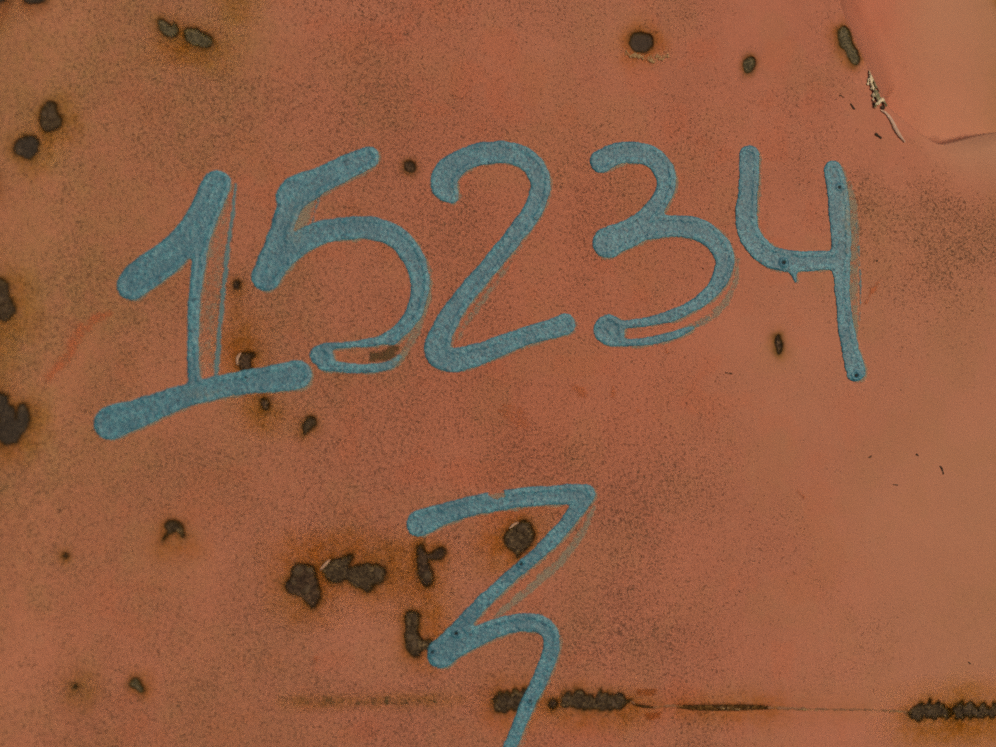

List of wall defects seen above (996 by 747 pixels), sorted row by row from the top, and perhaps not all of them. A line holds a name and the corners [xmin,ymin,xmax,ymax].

spalling [14,101,62,160]
spalling [0,278,16,322]
spalling [0,393,30,446]
crack [630,701,907,713]